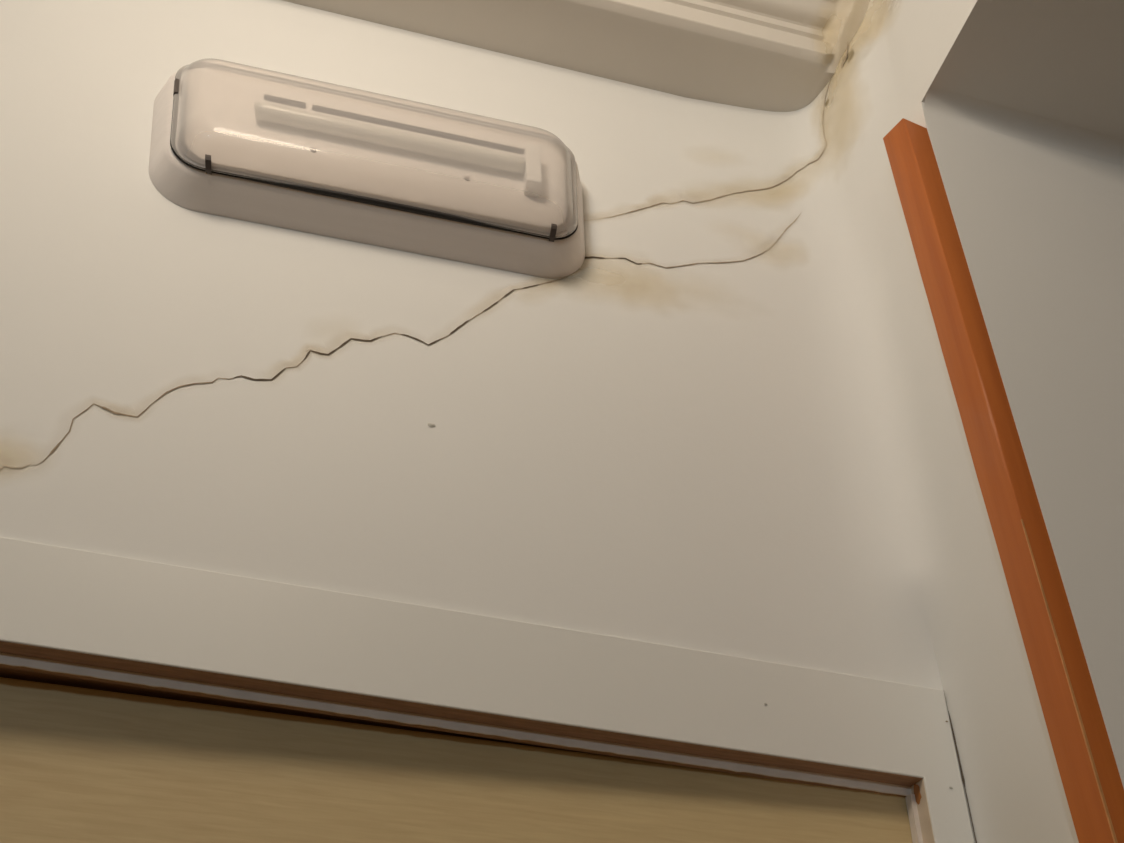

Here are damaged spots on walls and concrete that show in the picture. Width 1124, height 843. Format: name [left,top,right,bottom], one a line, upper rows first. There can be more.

crack [585,42,848,221]
crack [0,213,801,470]